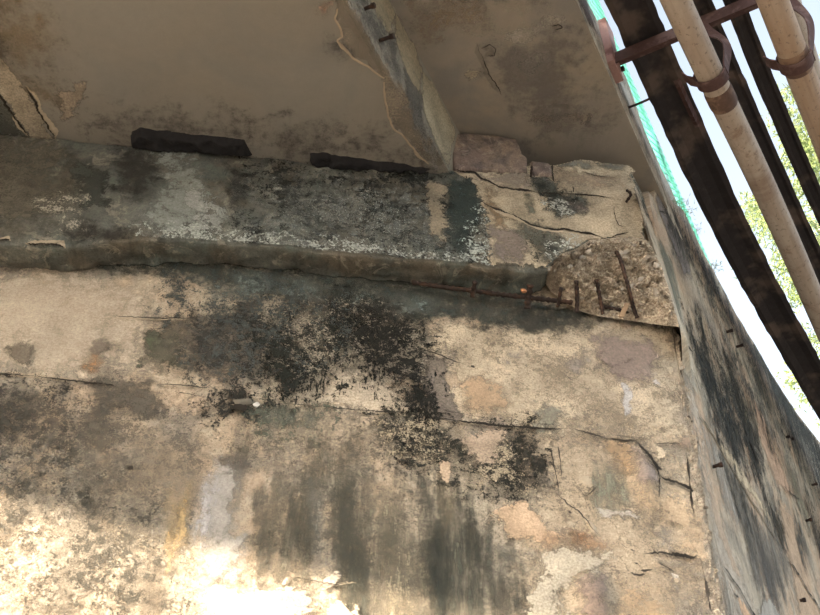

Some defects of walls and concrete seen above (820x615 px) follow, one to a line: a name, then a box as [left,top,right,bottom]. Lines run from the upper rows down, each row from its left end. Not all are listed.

water stain [112,0,645,268]
crack [475,44,501,94]
water stain [31,190,91,235]
crack [454,165,628,242]
crack [0,371,114,387]
crack [158,383,209,395]
water stain [0,203,820,615]
crack [284,403,694,537]
spalling [411,188,725,615]
crack [672,329,820,615]